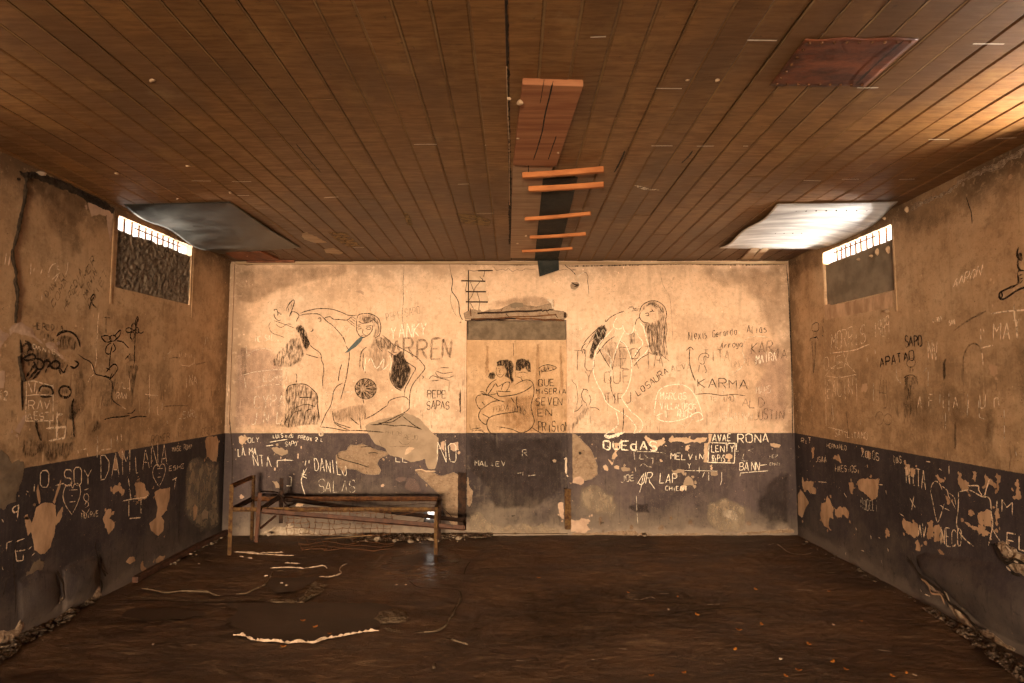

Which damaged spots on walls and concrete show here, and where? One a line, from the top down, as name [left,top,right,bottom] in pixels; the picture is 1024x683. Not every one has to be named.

flaking render [460,270,568,323]
peeling [24,480,63,576]
peeling [103,508,115,534]
peeling [110,476,170,537]
peeling [204,436,220,462]
flaking render [336,444,388,487]
flaking render [552,433,633,485]
flaking render [558,502,720,536]
peeling [644,434,718,491]
peeling [849,475,879,501]
peeling [902,518,944,555]
flaking render [935,471,1024,576]